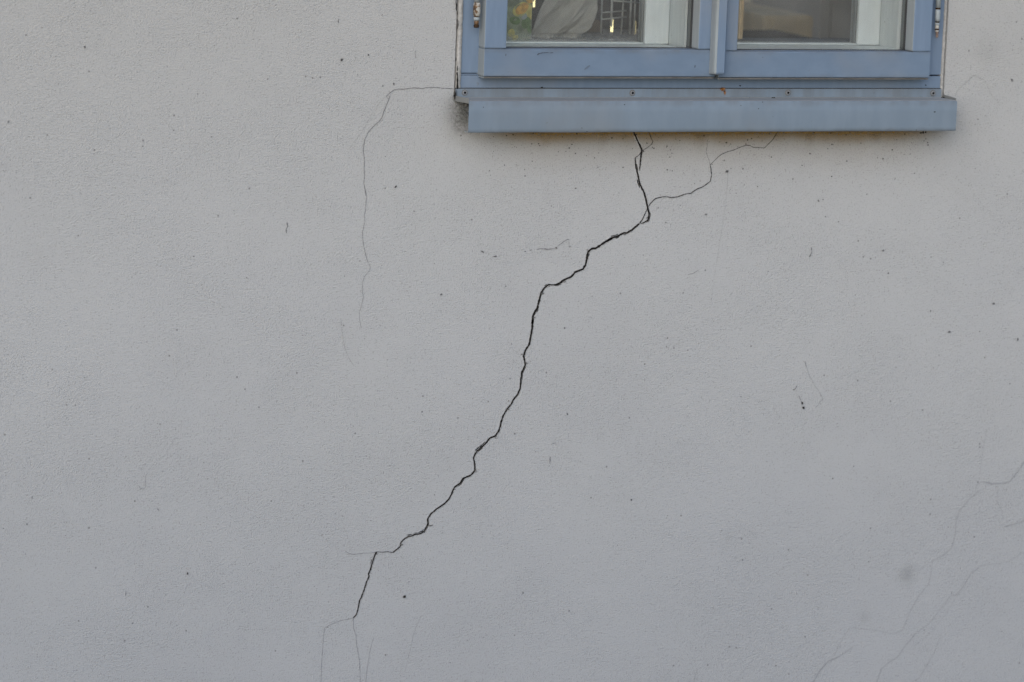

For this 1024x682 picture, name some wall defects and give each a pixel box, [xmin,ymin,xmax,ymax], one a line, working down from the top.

crack [352,132,777,619]